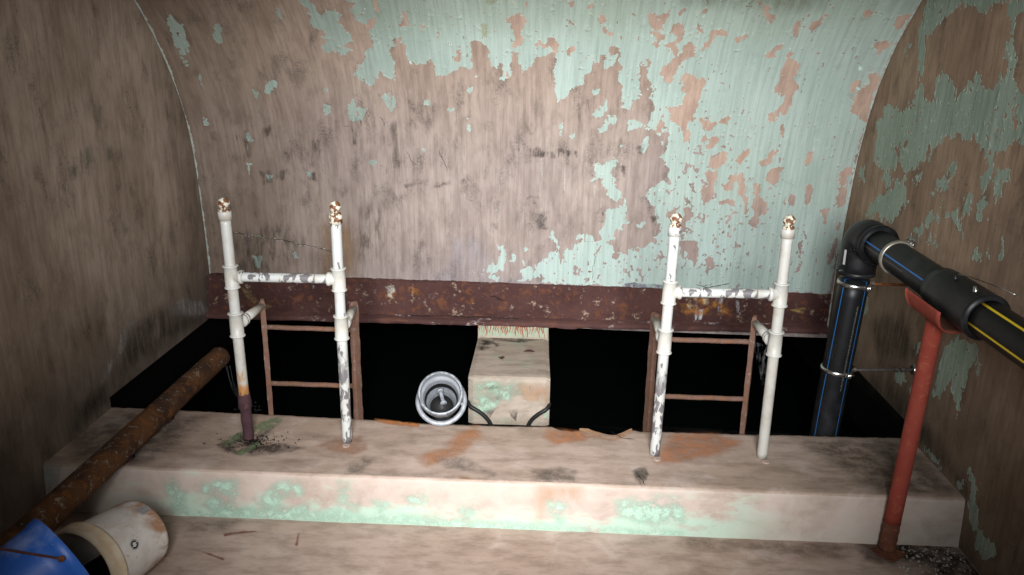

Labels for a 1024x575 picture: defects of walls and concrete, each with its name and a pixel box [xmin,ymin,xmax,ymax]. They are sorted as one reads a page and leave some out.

peeling [252,80,277,98]
peeling [134,0,211,274]
peeling [299,0,1024,327]
corrosion [478,325,548,338]
peeling [932,333,982,419]